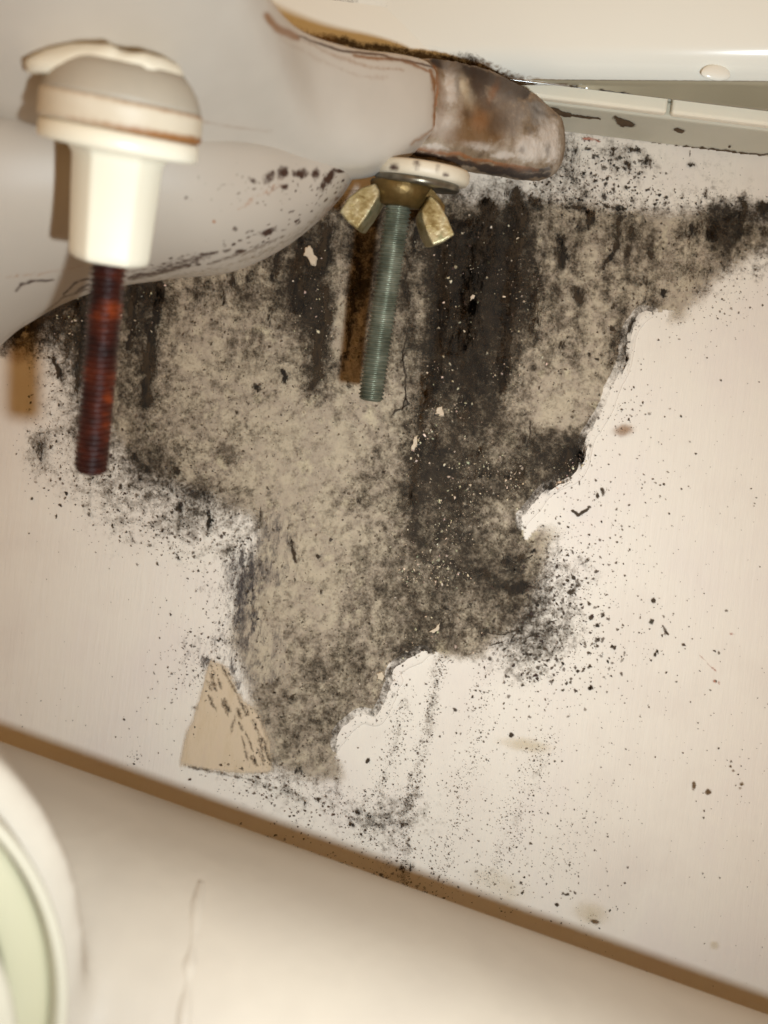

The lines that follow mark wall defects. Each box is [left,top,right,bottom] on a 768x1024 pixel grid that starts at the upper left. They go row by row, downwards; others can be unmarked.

leakage [0,137,768,941]
peeling [112,189,768,778]